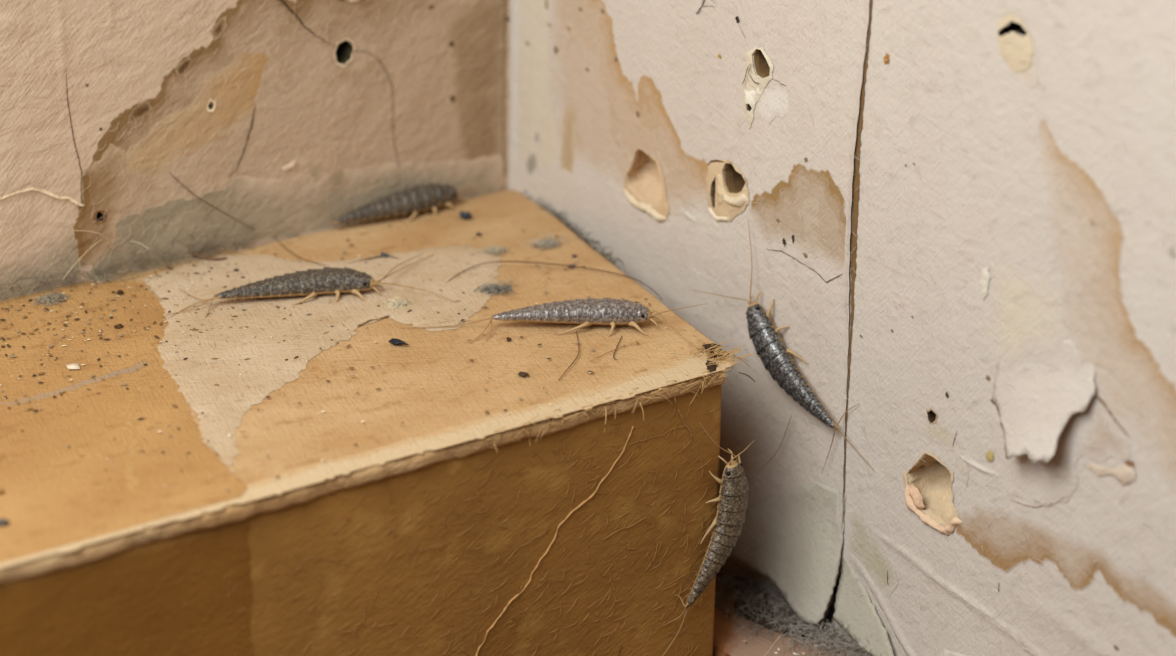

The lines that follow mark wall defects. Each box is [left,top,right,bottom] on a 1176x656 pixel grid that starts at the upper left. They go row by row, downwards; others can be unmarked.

hole [334,38,355,67]
spalling [742,47,790,129]
spalling [997,14,1034,72]
spalling [624,148,670,223]
spalling [706,159,749,222]
water stain [0,0,852,515]
crack [765,0,872,625]
water stain [985,118,1176,494]
spalling [901,452,962,536]
water stain [955,503,1176,638]